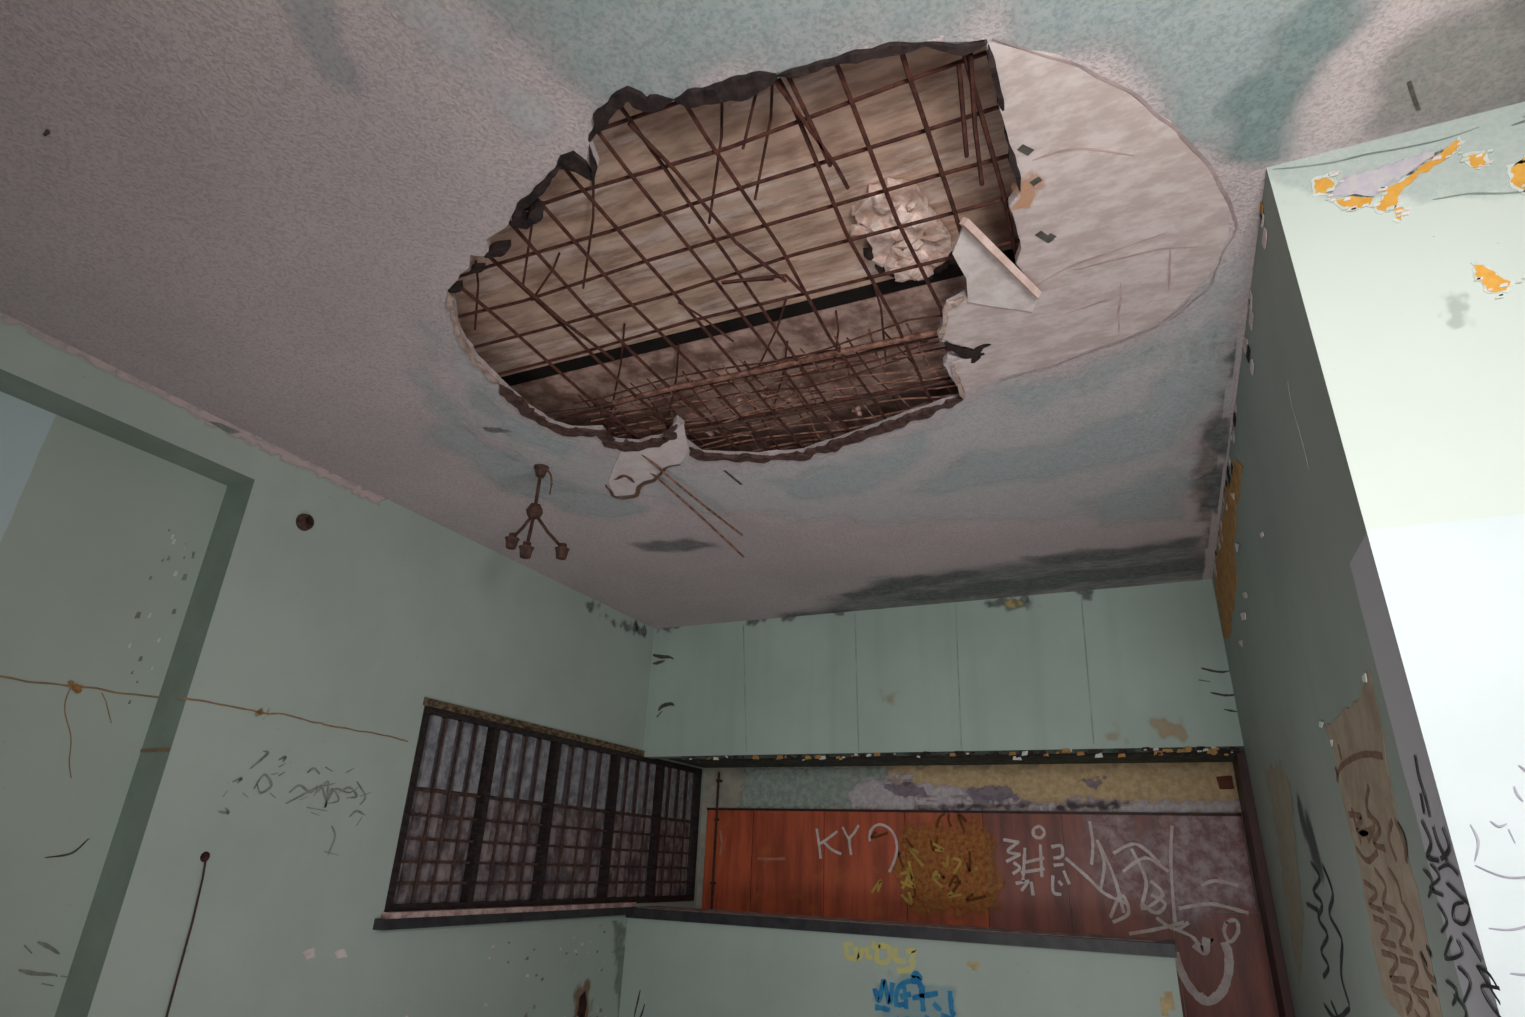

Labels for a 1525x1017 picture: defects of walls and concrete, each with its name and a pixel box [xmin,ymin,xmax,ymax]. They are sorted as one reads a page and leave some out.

damp [1227,0,1345,158]
damp [1378,0,1525,126]
peeling [1311,137,1525,223]
peeling [1259,202,1267,249]
peeling [1471,261,1525,299]
peeling [1243,288,1254,375]
damp [443,314,1236,625]
peeling [1213,403,1248,647]
damp [612,621,679,637]
peeling [681,746,1245,813]
peeling [1319,669,1442,1017]